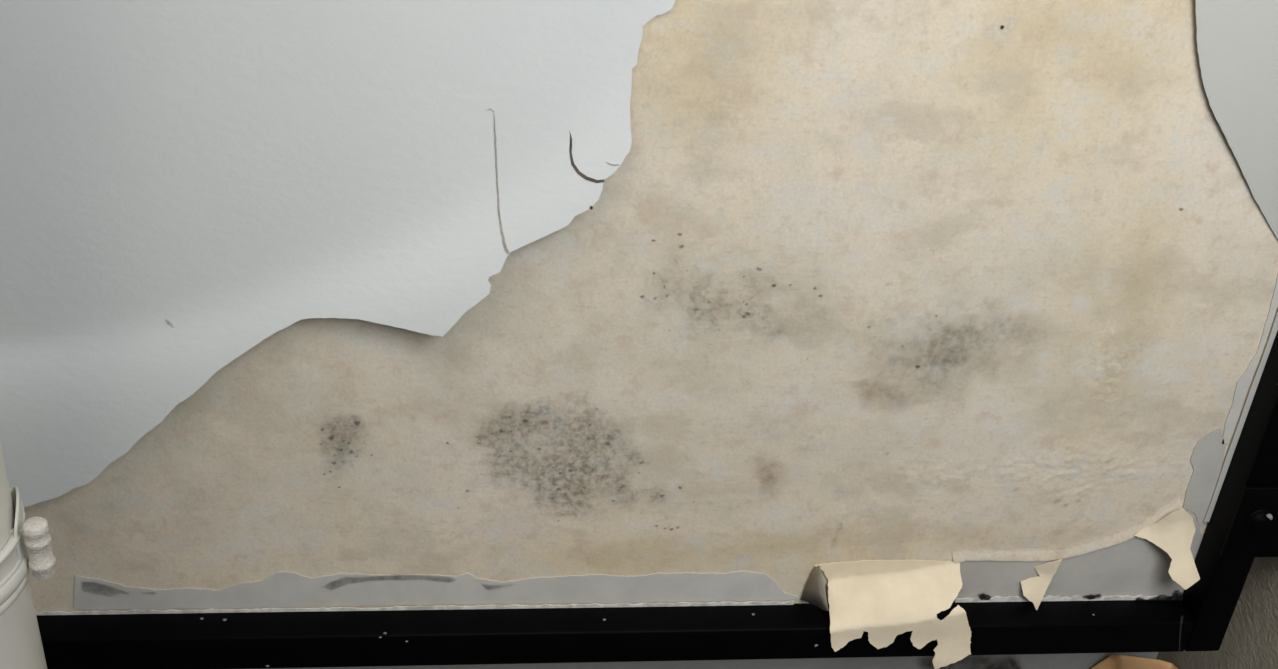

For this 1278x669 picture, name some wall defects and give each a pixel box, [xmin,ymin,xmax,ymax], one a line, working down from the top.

peeling [0,0,675,507]
crack [488,109,510,254]
crack [569,131,619,183]
peeling [1195,0,1278,239]
peeling [952,497,1203,602]